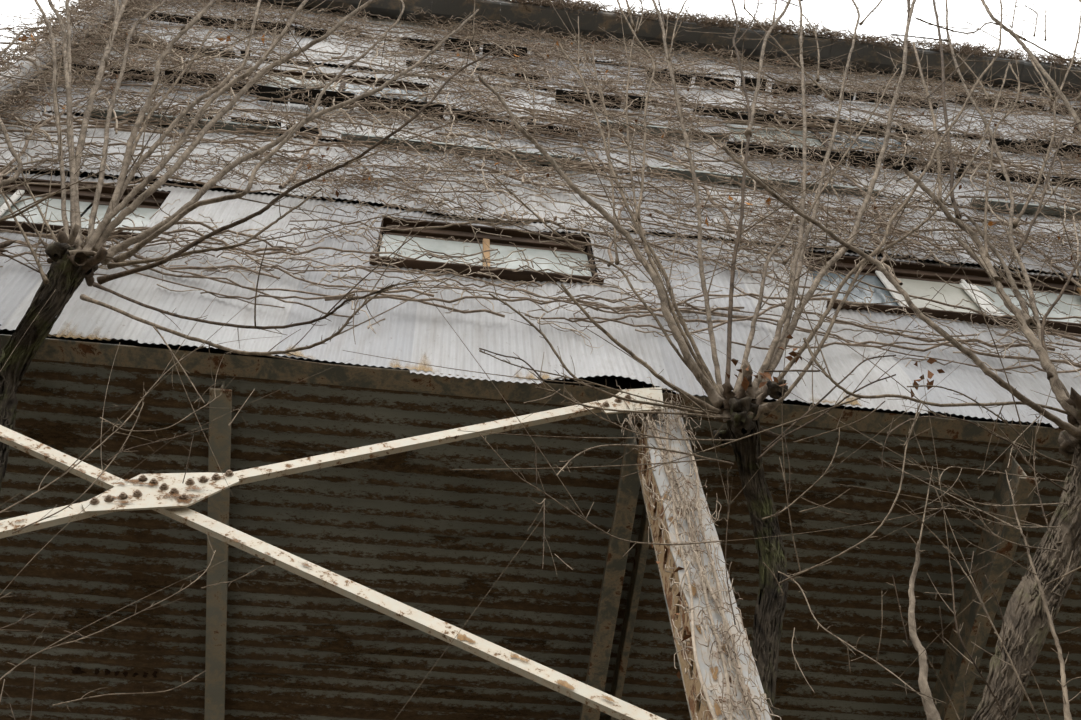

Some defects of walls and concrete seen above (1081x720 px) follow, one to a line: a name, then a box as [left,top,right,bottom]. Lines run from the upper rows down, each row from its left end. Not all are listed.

corrosion [4,407,208,504]
corrosion [266,442,316,461]
corrosion [367,451,495,509]
corrosion [769,479,866,553]
corrosion [49,589,179,643]
corrosion [233,625,469,691]
corrosion [348,610,419,630]
corrosion [440,619,476,643]
corrosion [775,672,816,712]